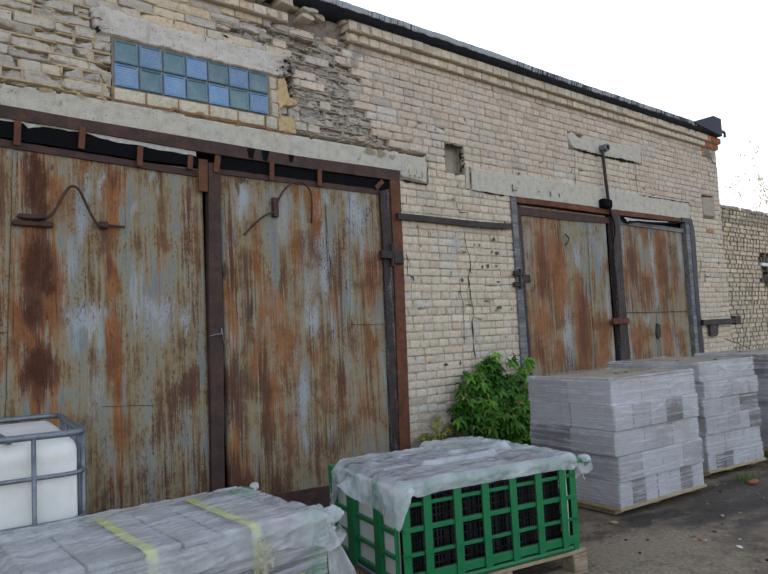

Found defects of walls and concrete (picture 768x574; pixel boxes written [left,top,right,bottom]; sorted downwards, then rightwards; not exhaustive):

spalling [184,15,395,160]
crack [458,233,478,361]